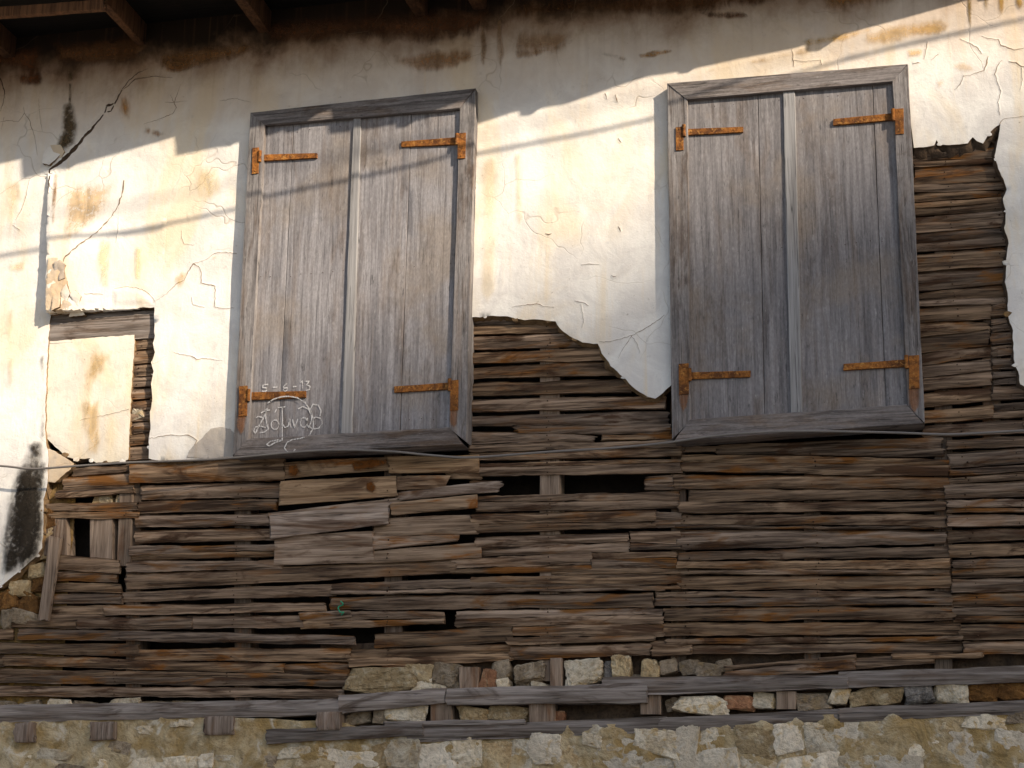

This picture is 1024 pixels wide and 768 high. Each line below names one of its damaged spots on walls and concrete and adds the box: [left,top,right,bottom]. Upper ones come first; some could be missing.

leakage [59,73,76,148]
crack [0,68,187,232]
leakage [162,46,247,70]
leakage [270,10,486,69]
crack [954,35,1024,125]
crack [84,230,237,310]
spalling [914,125,1024,390]
spalling [473,316,665,403]
spalling [50,442,130,466]
peeling [147,427,234,465]
leakage [4,443,43,571]
spalling [0,500,49,590]